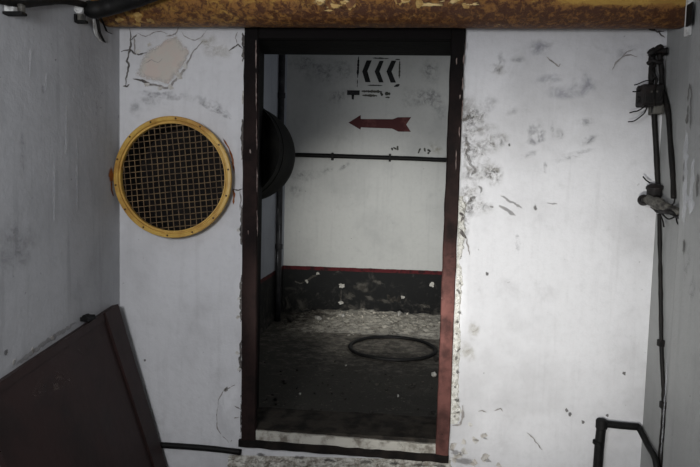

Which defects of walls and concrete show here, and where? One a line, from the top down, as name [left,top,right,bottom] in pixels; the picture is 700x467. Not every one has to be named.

crack [121,28,144,87]
peeling [115,12,205,90]
flaking render [450,196,473,427]